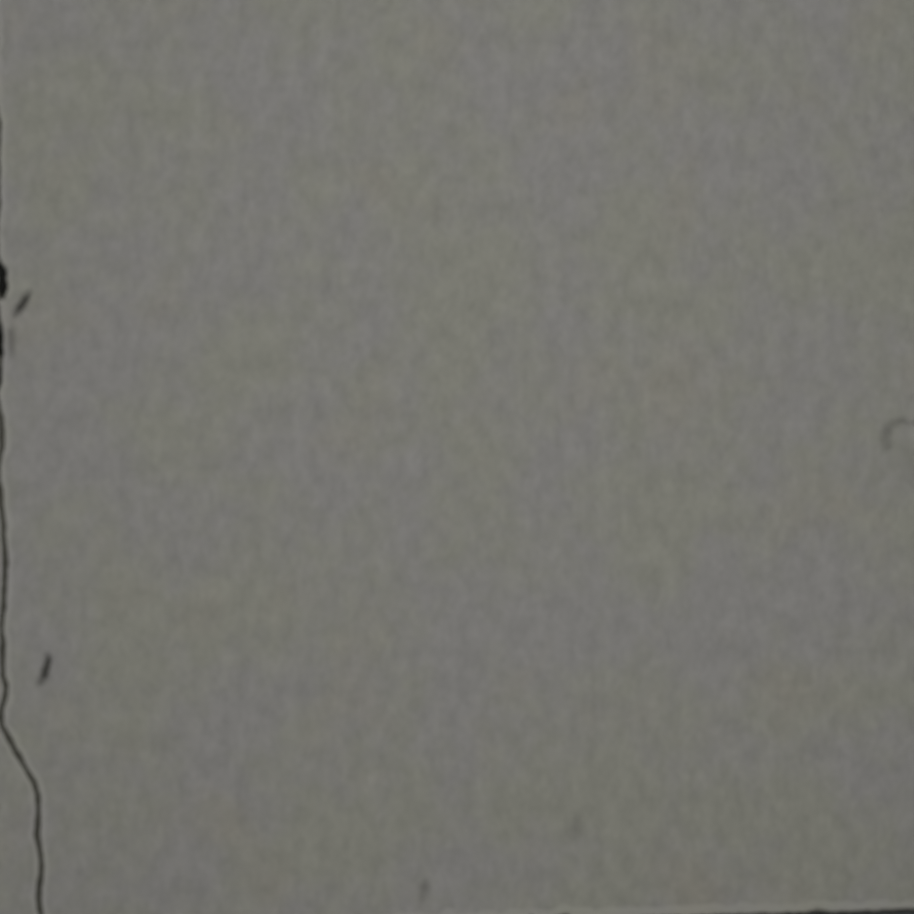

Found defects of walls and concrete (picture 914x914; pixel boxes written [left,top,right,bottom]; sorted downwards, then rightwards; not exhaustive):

crack [0,9,49,914]